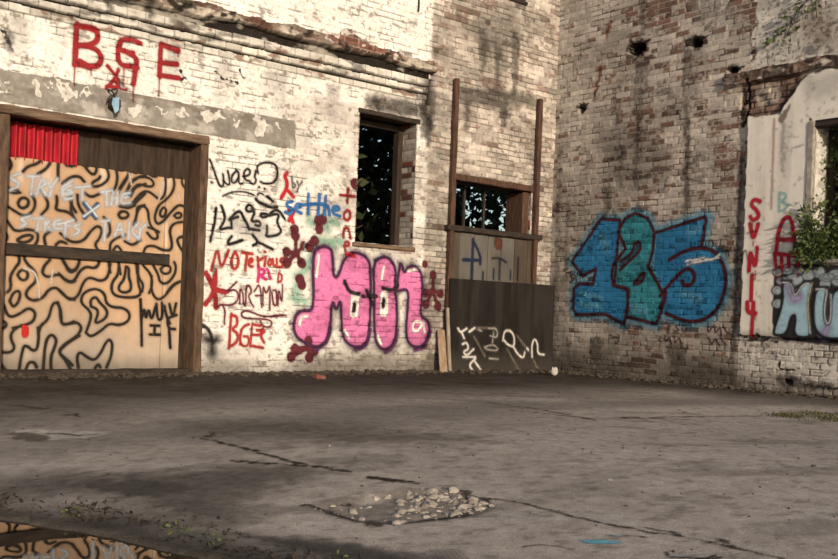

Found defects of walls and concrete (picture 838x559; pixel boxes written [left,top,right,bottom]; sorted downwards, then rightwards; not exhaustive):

hole [626,38,651,57]
spalling [686,34,709,50]
flaking render [749,0,758,61]
peeling [32,78,92,103]
water stain [459,32,533,130]
peeling [128,104,143,118]
peeling [154,105,189,118]
peeling [199,109,240,129]
peeling [252,112,281,137]
water stain [602,187,611,212]